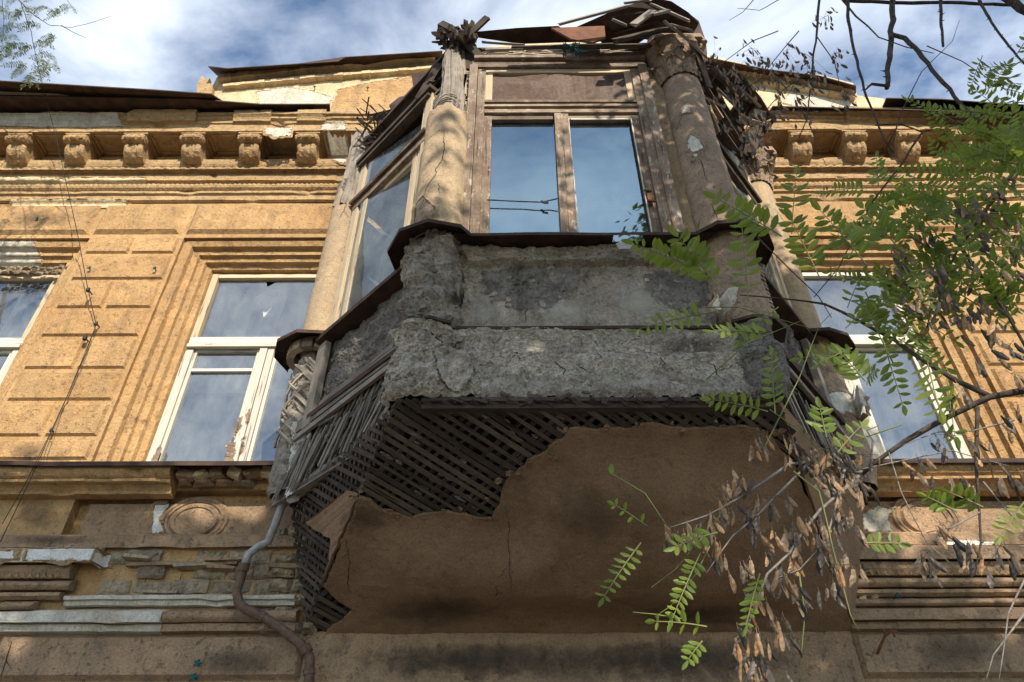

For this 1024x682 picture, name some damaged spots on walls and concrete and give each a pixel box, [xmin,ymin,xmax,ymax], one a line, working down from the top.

flaking render [254,76,413,165]
crack [425,130,446,194]
spalling [683,131,708,162]
peeling [224,408,251,461]
spalling [349,419,793,522]
spalling [148,499,174,534]
spalling [862,503,896,532]
spalling [0,515,353,635]